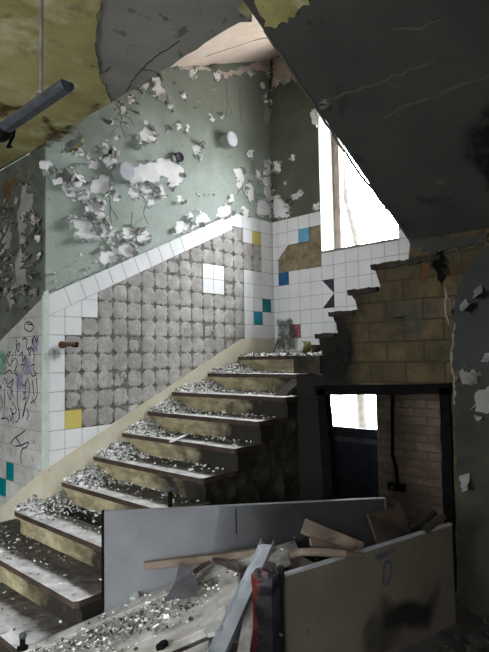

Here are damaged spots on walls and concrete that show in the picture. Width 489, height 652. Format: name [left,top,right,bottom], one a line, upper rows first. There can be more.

leakage [0,103,22,117]
leakage [40,117,74,148]
peeling [0,0,187,278]
crack [126,40,180,91]
crack [325,60,489,122]
peeling [0,181,51,309]
peeling [164,0,489,617]